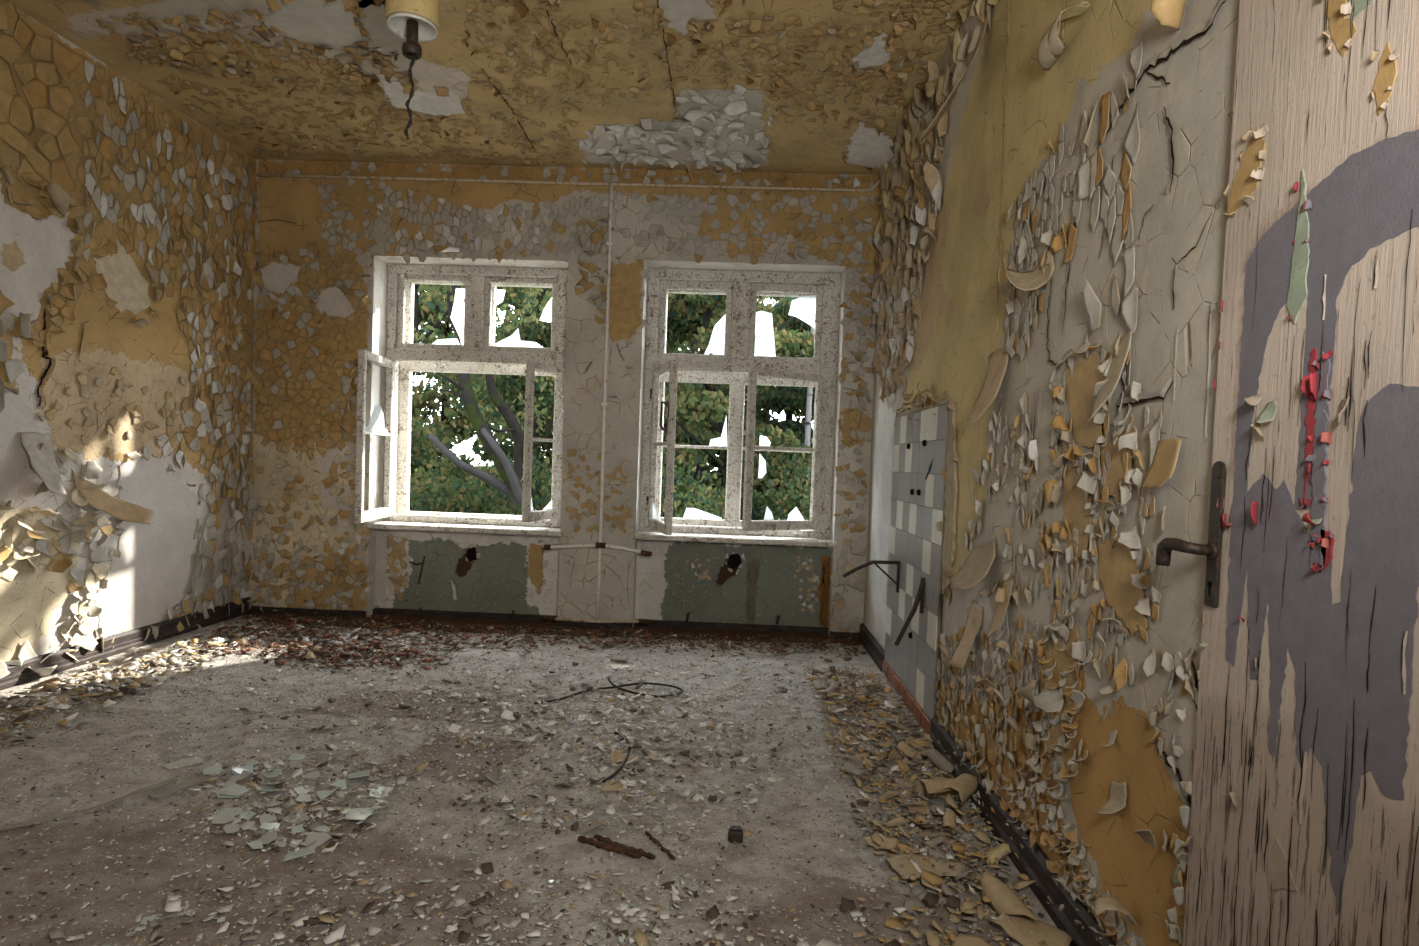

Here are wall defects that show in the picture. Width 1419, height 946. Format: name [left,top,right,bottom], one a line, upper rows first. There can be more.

peeling [1320,0,1373,56]
peeling [1370,41,1400,115]
peeling [1001,37,1144,362]
crack [1027,0,1226,489]
peeling [1222,123,1269,220]
peeling [1286,169,1312,323]
peeling [0,0,998,679]
peeling [1250,501,1258,527]
peeling [1244,394,1278,441]
peeling [1299,348,1350,573]
peeling [935,277,1209,946]